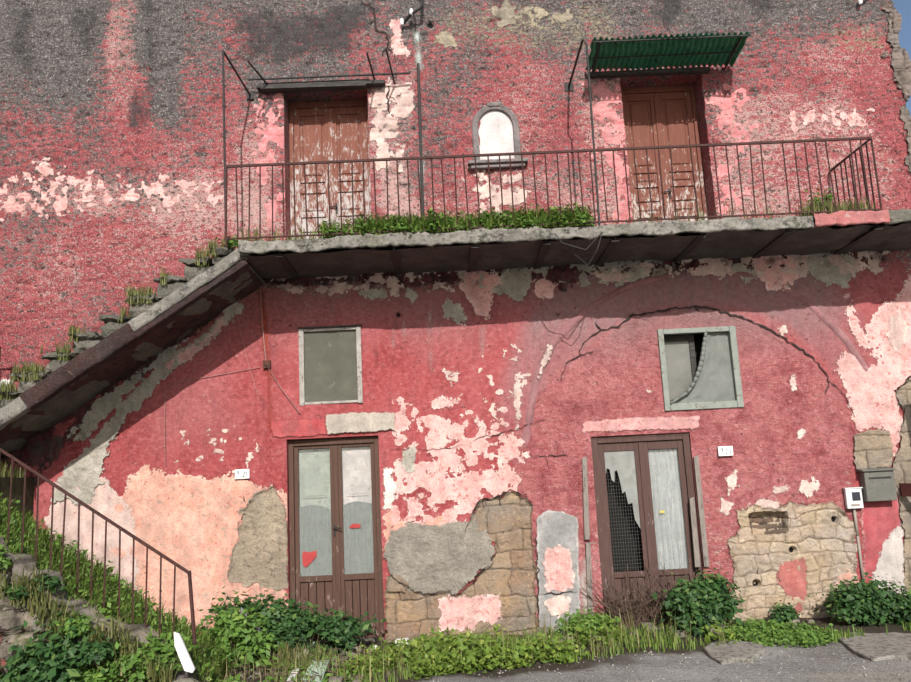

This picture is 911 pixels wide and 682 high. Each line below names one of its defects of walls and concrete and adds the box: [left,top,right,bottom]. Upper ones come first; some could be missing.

crack [361,0,396,114]
spalling [491,0,573,30]
spalling [369,77,415,173]
peeling [0,157,230,222]
crack [561,305,855,417]
peeling [0,299,289,629]
spalling [262,251,911,643]